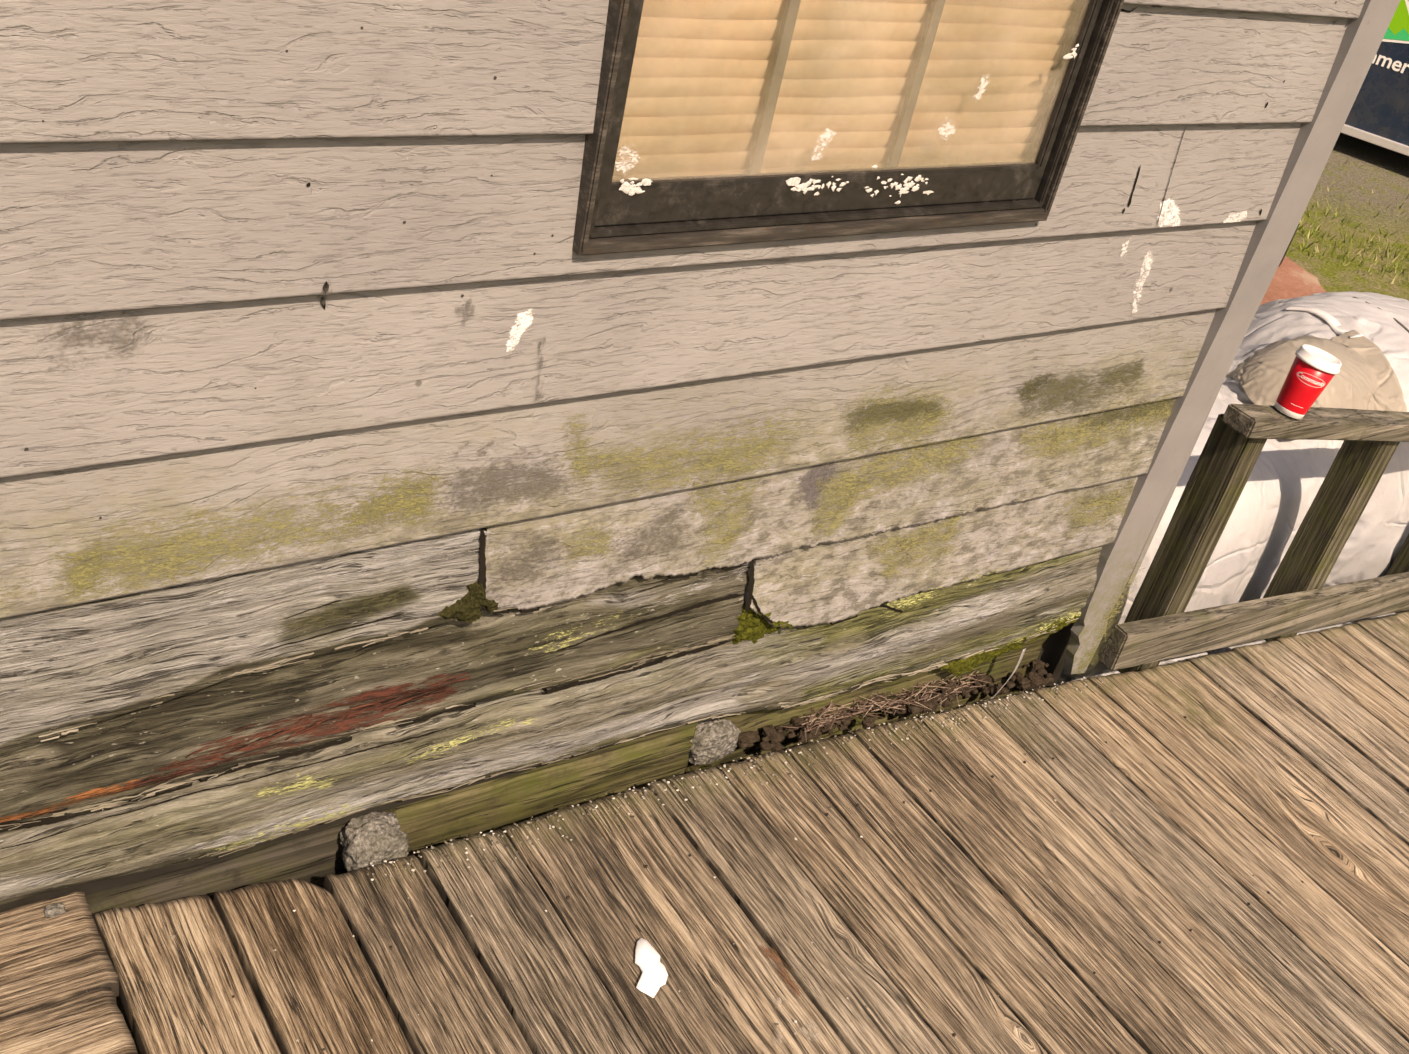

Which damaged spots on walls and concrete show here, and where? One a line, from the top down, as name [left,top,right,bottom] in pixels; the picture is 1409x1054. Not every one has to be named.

crack [1123,127,1186,227]
leakage [846,400,941,432]
leakage [1082,398,1174,426]
crack [478,528,540,613]
crack [542,559,774,694]
leakage [0,673,470,823]